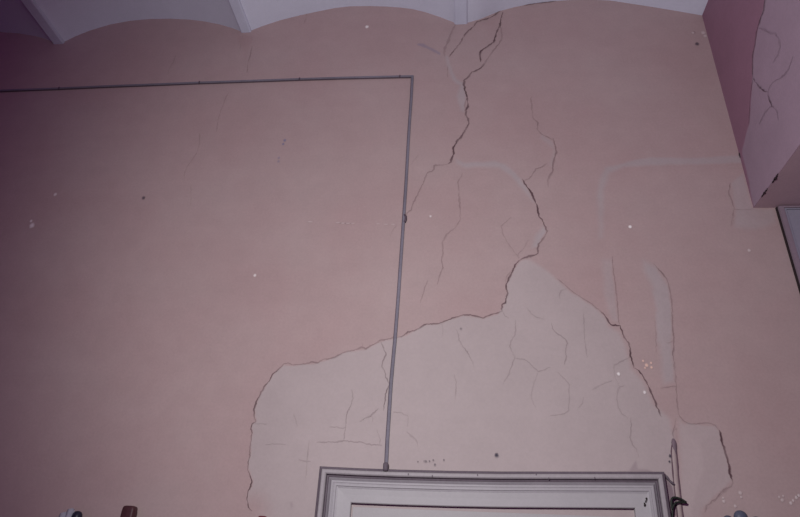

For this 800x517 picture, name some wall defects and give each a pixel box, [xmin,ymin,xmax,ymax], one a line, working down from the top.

crack [406,11,503,302]
crack [748,0,793,124]
crack [246,97,733,512]